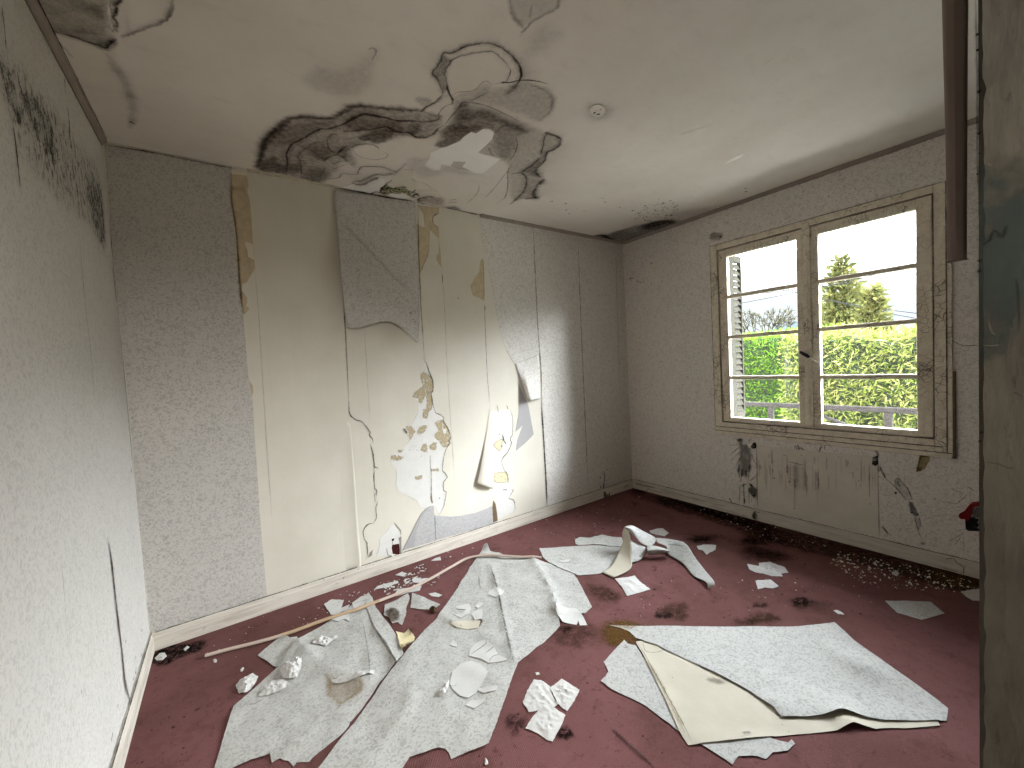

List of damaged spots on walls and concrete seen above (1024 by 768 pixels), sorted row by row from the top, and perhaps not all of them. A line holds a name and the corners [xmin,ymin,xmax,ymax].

damp [0,62,105,243]
peeling [231,171,255,315]
damp [259,43,523,179]
peeling [470,259,484,301]
damp [505,132,561,202]
damp [596,202,677,242]
spalling [368,362,451,558]
spalling [477,407,515,519]
damp [658,439,979,591]
crack [110,552,129,697]